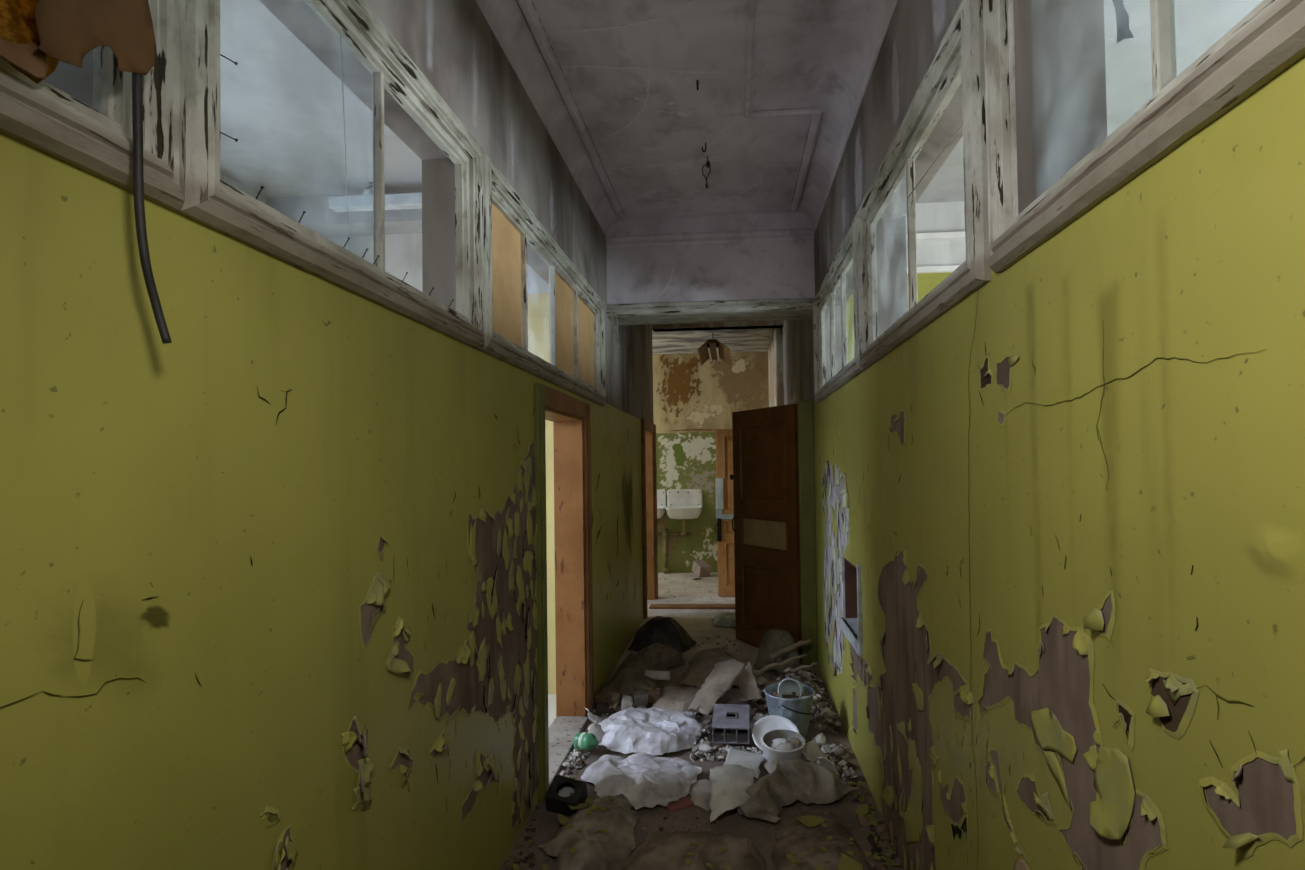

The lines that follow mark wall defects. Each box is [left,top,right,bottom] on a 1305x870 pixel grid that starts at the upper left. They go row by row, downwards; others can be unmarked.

flaking render [658,356,766,504]
peeling [979,353,1019,393]
crack [968,289,1265,509]
peeling [682,526,718,567]
crack [0,601,145,708]
peeling [341,440,540,840]
peeling [821,461,1199,870]
peeling [260,806,298,870]
peeling [1199,749,1303,859]